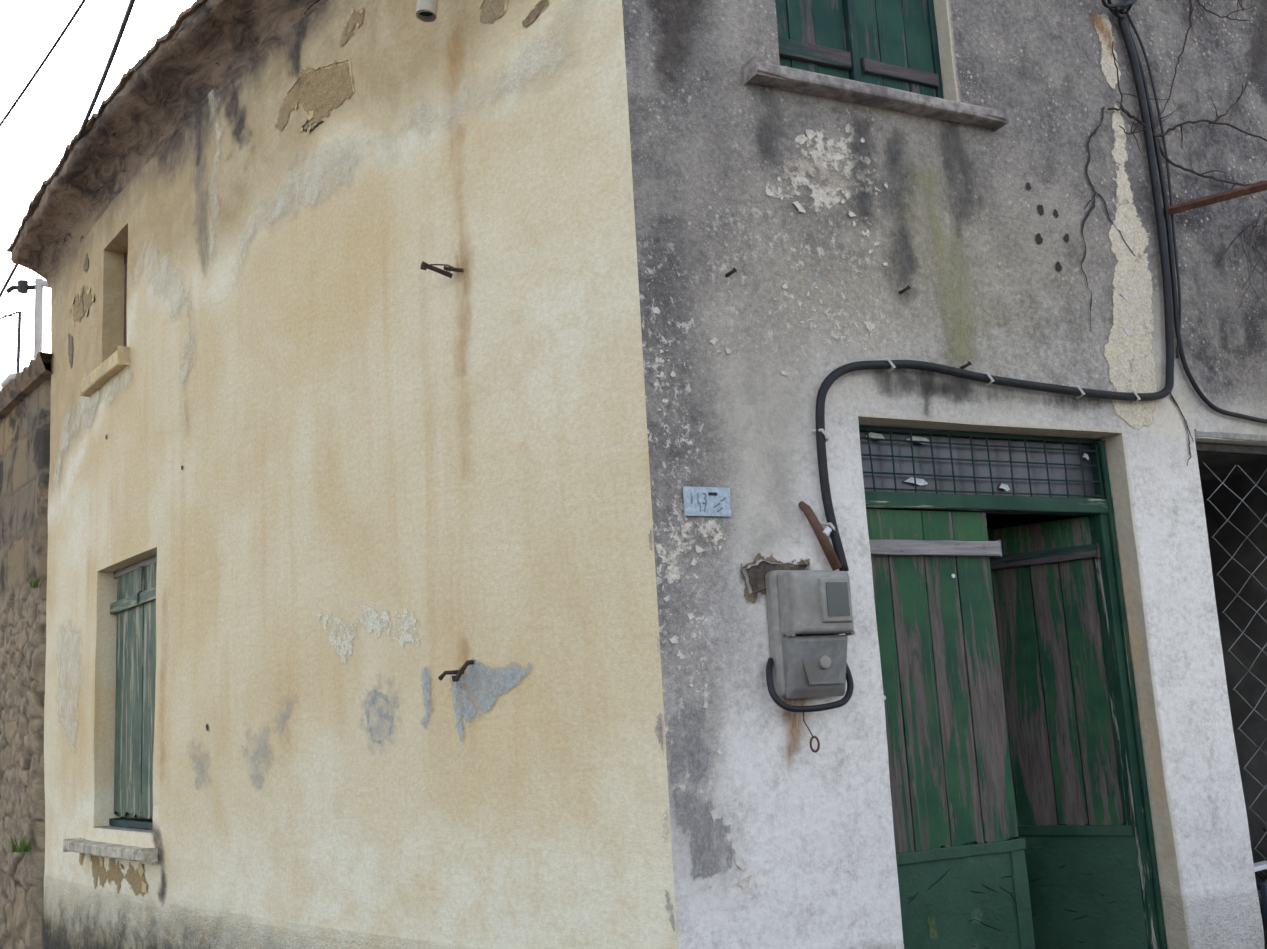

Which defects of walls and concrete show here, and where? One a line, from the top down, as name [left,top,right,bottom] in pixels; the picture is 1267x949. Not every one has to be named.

damp [289,17,304,73]
flaking render [275,8,364,136]
spalling [480,0,509,23]
spalling [522,0,549,27]
damp [652,0,698,77]
damp [193,90,244,260]
peeling [765,123,888,254]
crack [1081,107,1136,330]
flaking render [79,838,147,896]